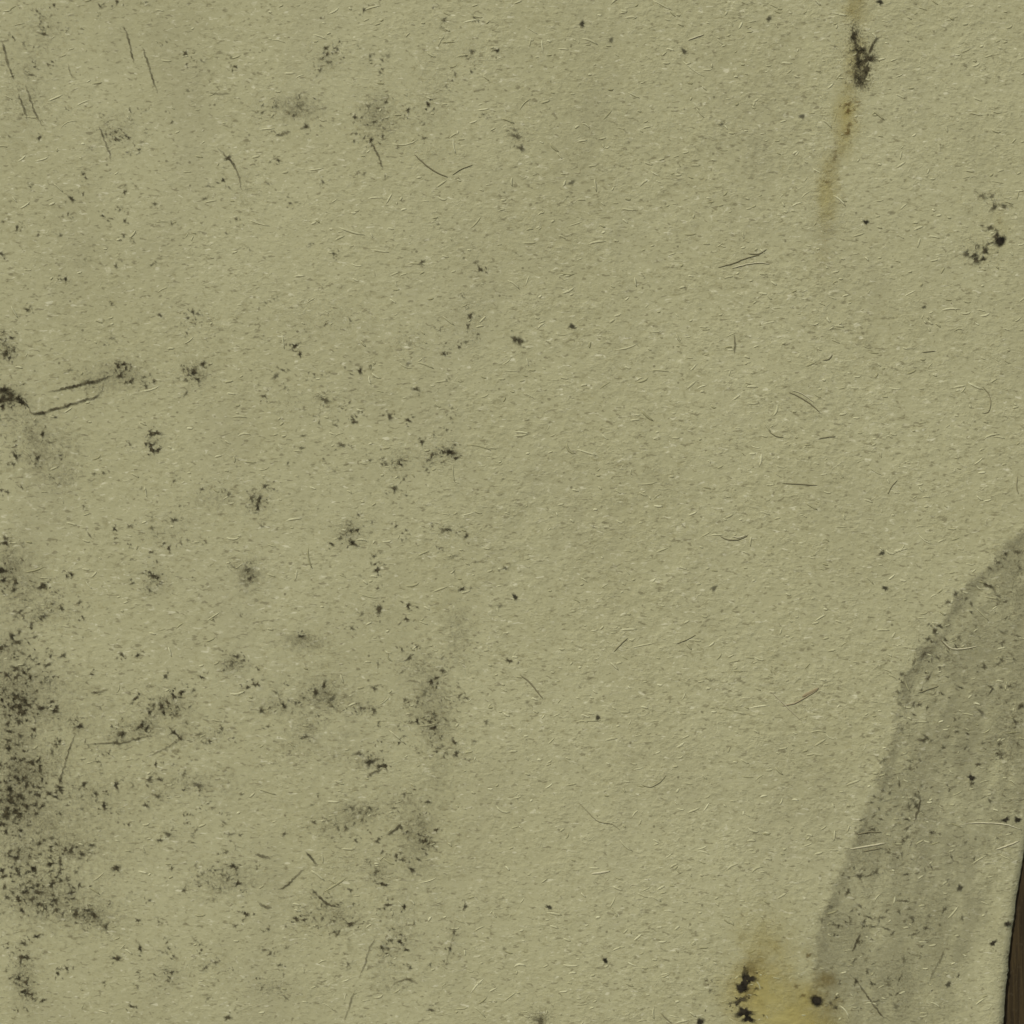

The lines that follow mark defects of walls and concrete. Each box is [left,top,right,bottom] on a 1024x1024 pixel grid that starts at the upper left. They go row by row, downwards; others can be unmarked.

corrosion [851,27,875,87]